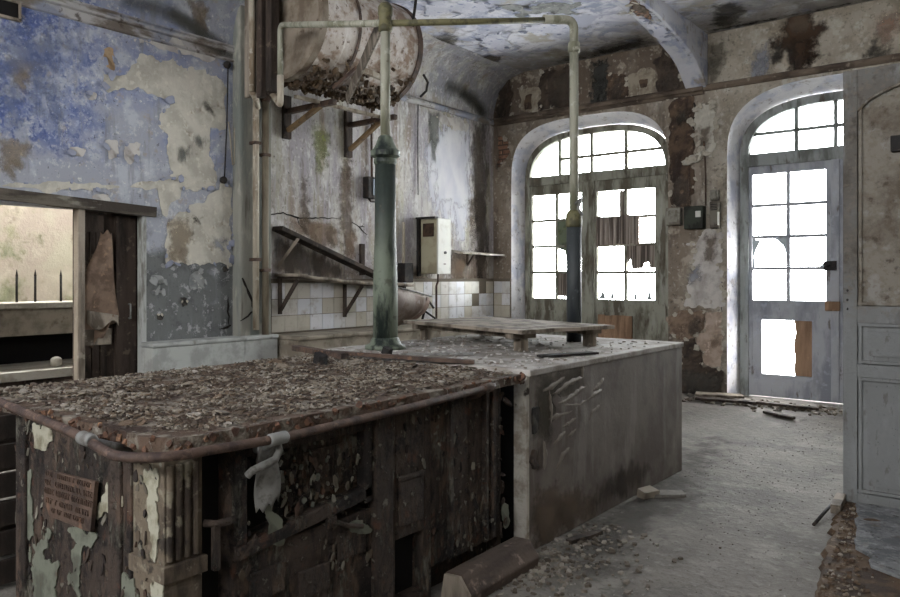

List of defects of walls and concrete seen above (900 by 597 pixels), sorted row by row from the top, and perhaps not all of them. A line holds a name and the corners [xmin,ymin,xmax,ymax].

peeling [411,0,582,36]
peeling [474,31,511,52]
rust [284,58,415,111]
spalling [496,79,524,118]
spalling [532,63,580,112]
spalling [606,72,633,100]
peeling [2,37,235,307]
crack [271,212,367,235]